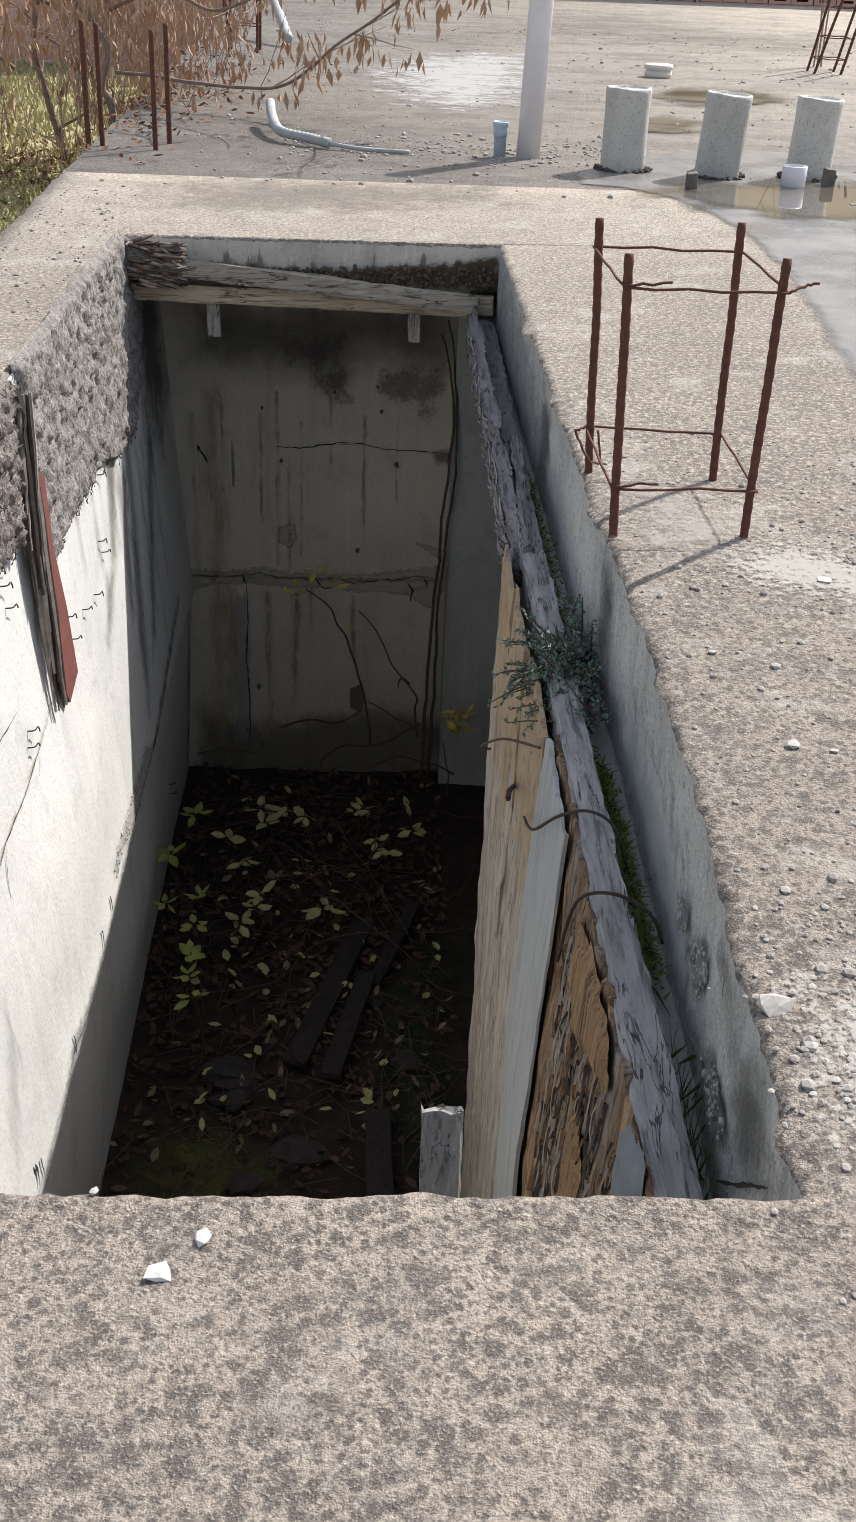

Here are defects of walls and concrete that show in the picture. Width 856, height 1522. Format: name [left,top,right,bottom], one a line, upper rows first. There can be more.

peeling [0,231,146,575]
crack [278,442,443,454]
crack [0,708,51,896]
crack [153,566,447,768]
water stain [205,712,439,773]
crack [35,812,137,1185]